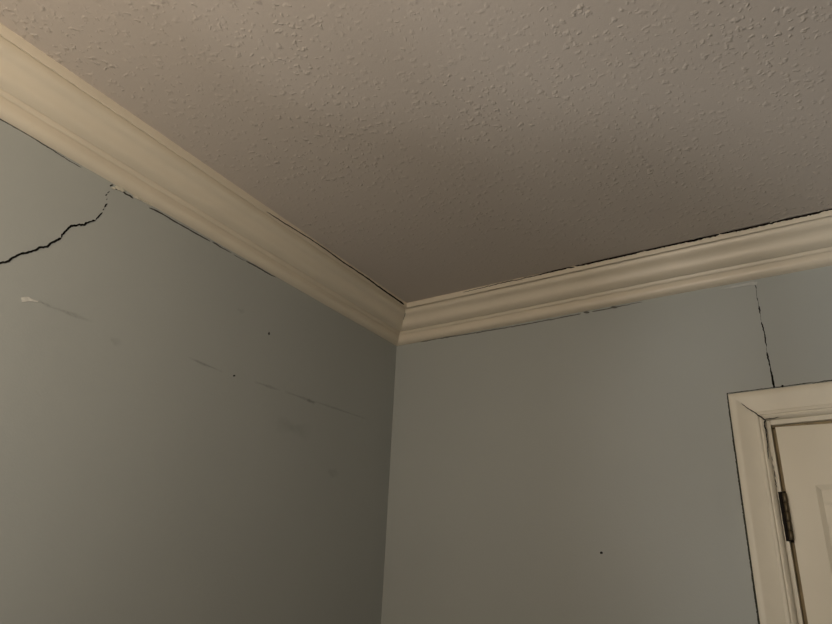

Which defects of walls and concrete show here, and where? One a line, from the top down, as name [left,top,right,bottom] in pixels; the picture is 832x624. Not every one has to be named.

crack [0,119,80,167]
crack [0,184,133,264]
crack [150,208,275,277]
crack [267,212,405,320]
crack [465,207,832,292]
crack [727,285,832,624]